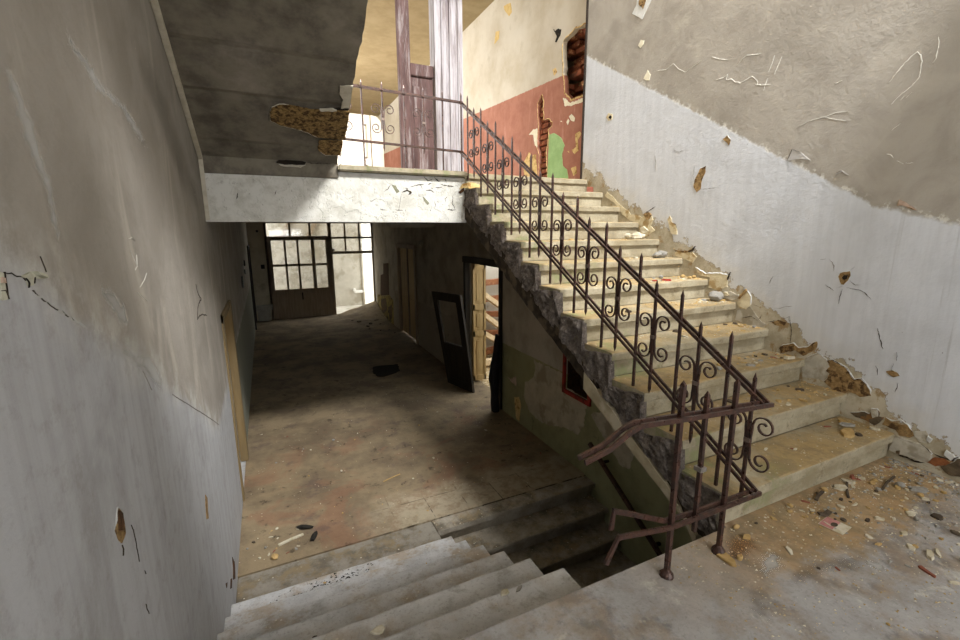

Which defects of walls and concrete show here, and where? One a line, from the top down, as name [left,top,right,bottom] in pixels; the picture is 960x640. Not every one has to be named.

flaking render [269,85,353,156]
spalling [523,23,586,179]
flaking render [693,166,716,192]
crack [6,272,86,328]
spalling [827,271,870,304]
flaking render [726,341,872,410]
spalling [115,507,126,556]